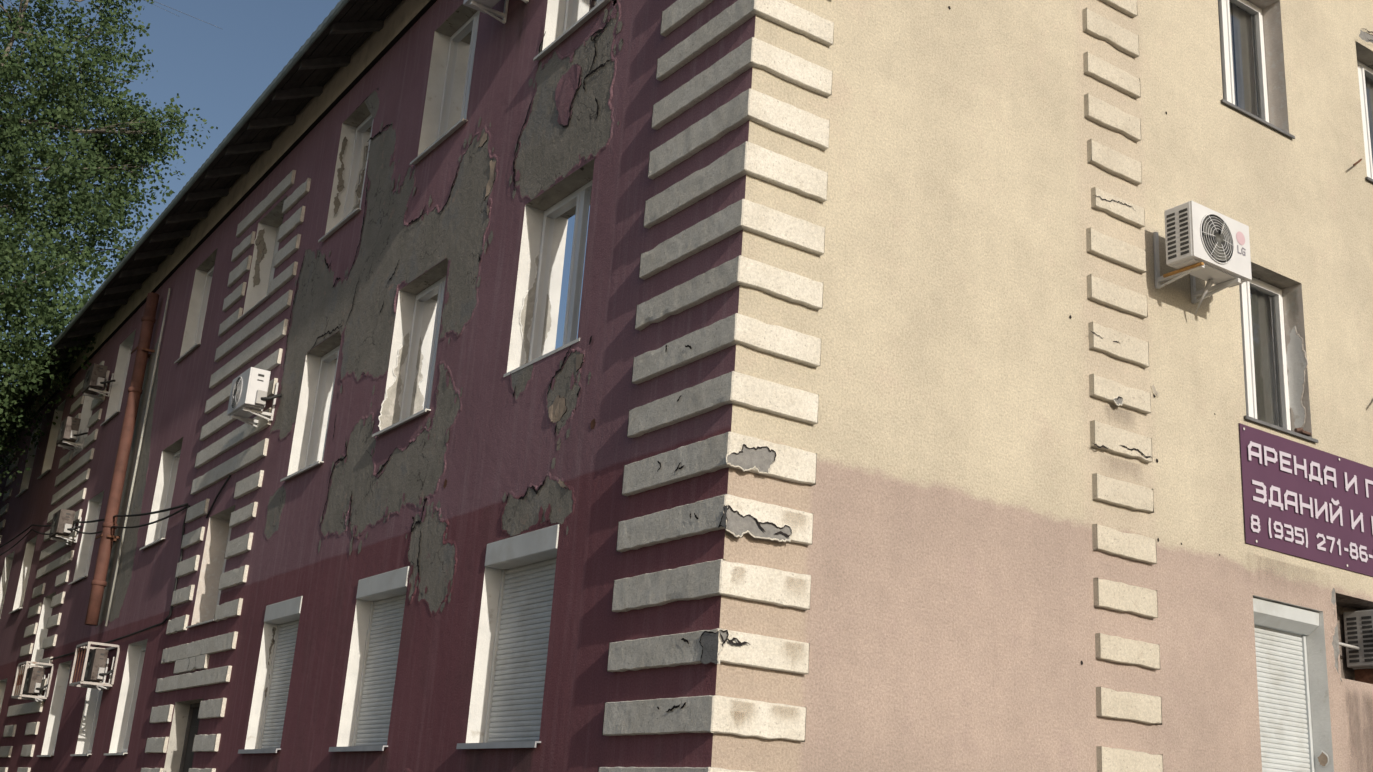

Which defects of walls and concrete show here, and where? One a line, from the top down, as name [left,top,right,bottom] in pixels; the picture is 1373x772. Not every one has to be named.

peeling [269,0,623,617]
spalling [726,443,776,475]
crack [1093,443,1152,458]
spalling [718,504,792,542]
spalling [681,628,750,664]